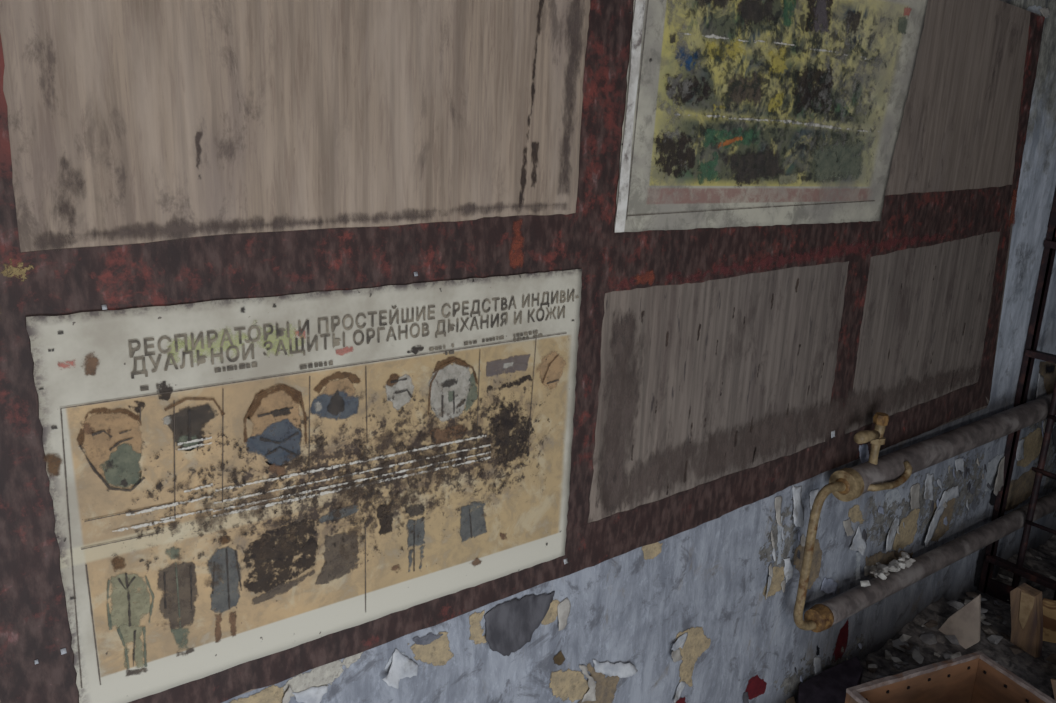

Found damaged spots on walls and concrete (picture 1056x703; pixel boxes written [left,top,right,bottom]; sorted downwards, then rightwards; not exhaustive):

peeling [759,485,839,600]
peeling [843,426,1046,585]
peeling [230,652,363,703]
peeling [382,632,454,689]
peeling [469,591,571,656]
peeling [549,651,638,703]
peeling [671,627,711,703]
spalling [939,548,986,649]